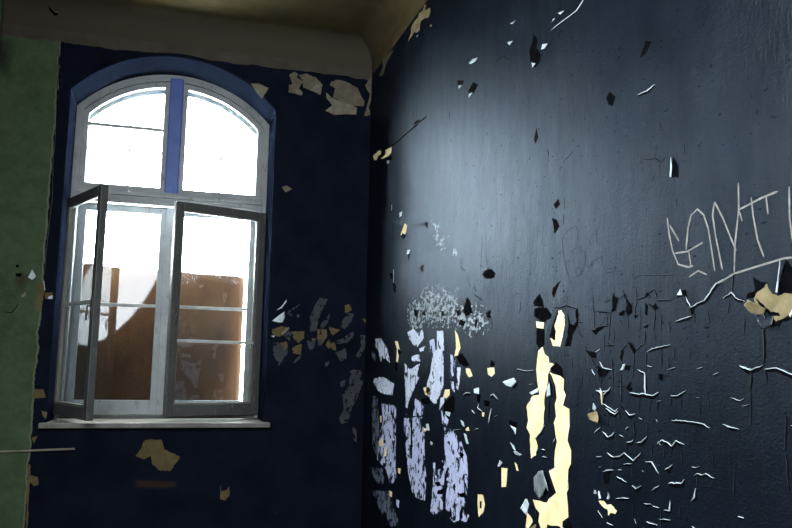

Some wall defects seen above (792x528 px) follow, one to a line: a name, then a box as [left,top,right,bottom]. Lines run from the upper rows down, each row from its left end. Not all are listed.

peeling [408,5,432,41]
peeling [529,34,548,67]
peeling [288,50,394,116]
peeling [457,80,478,98]
peeling [670,158,679,178]
peeling [552,198,565,233]
peeling [425,216,458,257]
peeling [480,249,496,279]
peeling [722,260,792,329]
peeling [272,266,498,527]
peeling [498,280,686,528]
peeling [136,439,180,471]